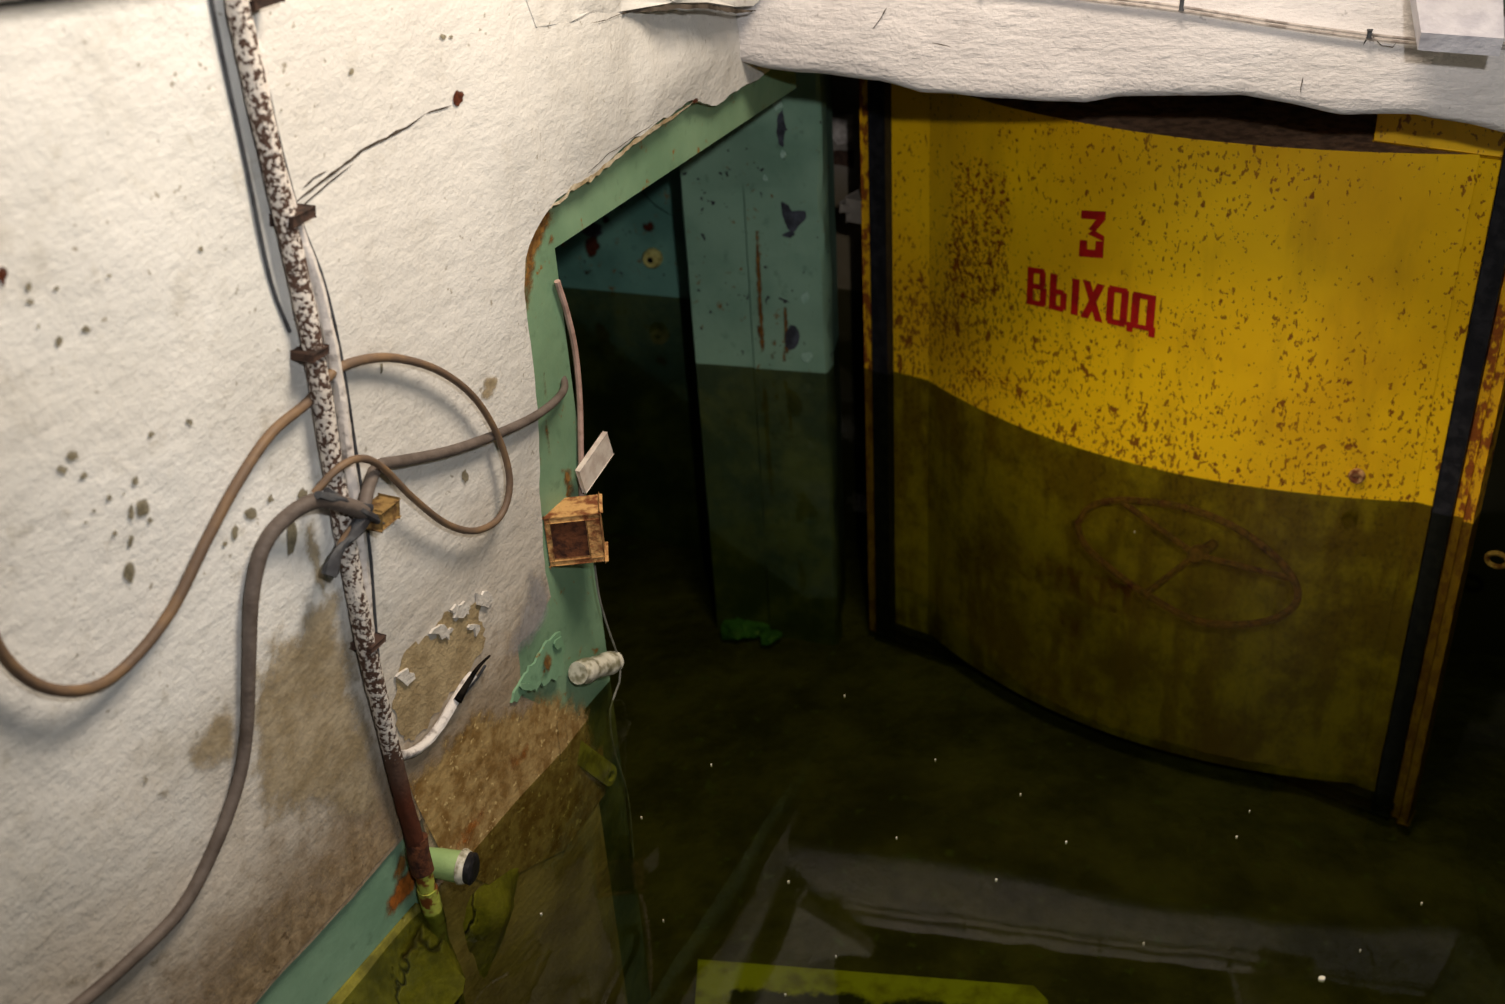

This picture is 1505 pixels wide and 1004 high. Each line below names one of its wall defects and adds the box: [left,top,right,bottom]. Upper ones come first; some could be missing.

crack [297,105,452,204]
damp [223,495,274,546]
spalling [392,590,494,741]
peeling [510,631,566,703]
damp [192,715,233,766]
damp [206,522,403,1004]
damp [409,696,605,885]